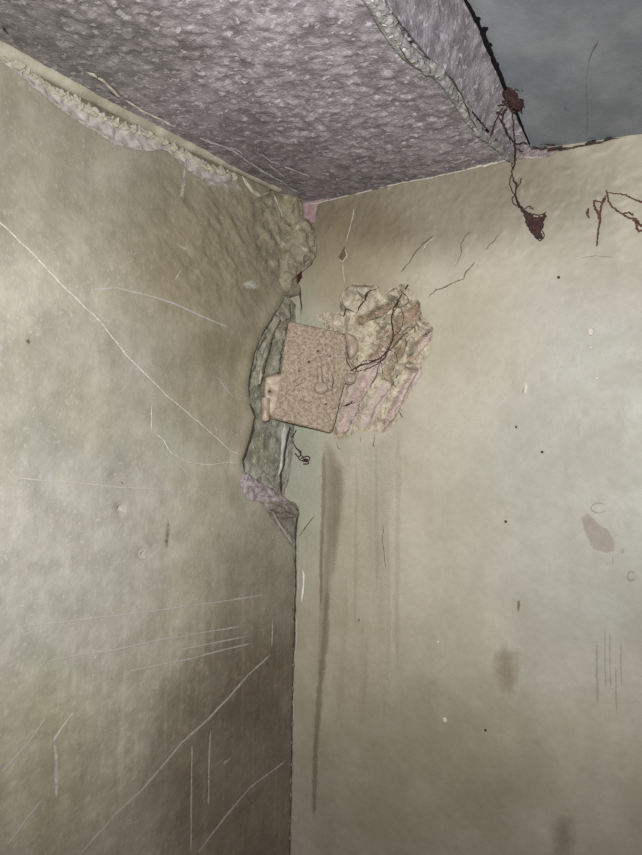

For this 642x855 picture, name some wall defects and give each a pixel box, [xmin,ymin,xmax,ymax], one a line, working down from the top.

crack [464,0,507,91]
peeling [0,56,242,197]
crack [339,160,506,283]
crack [429,232,497,296]
flaking render [241,296,300,549]
flaking render [316,282,433,449]